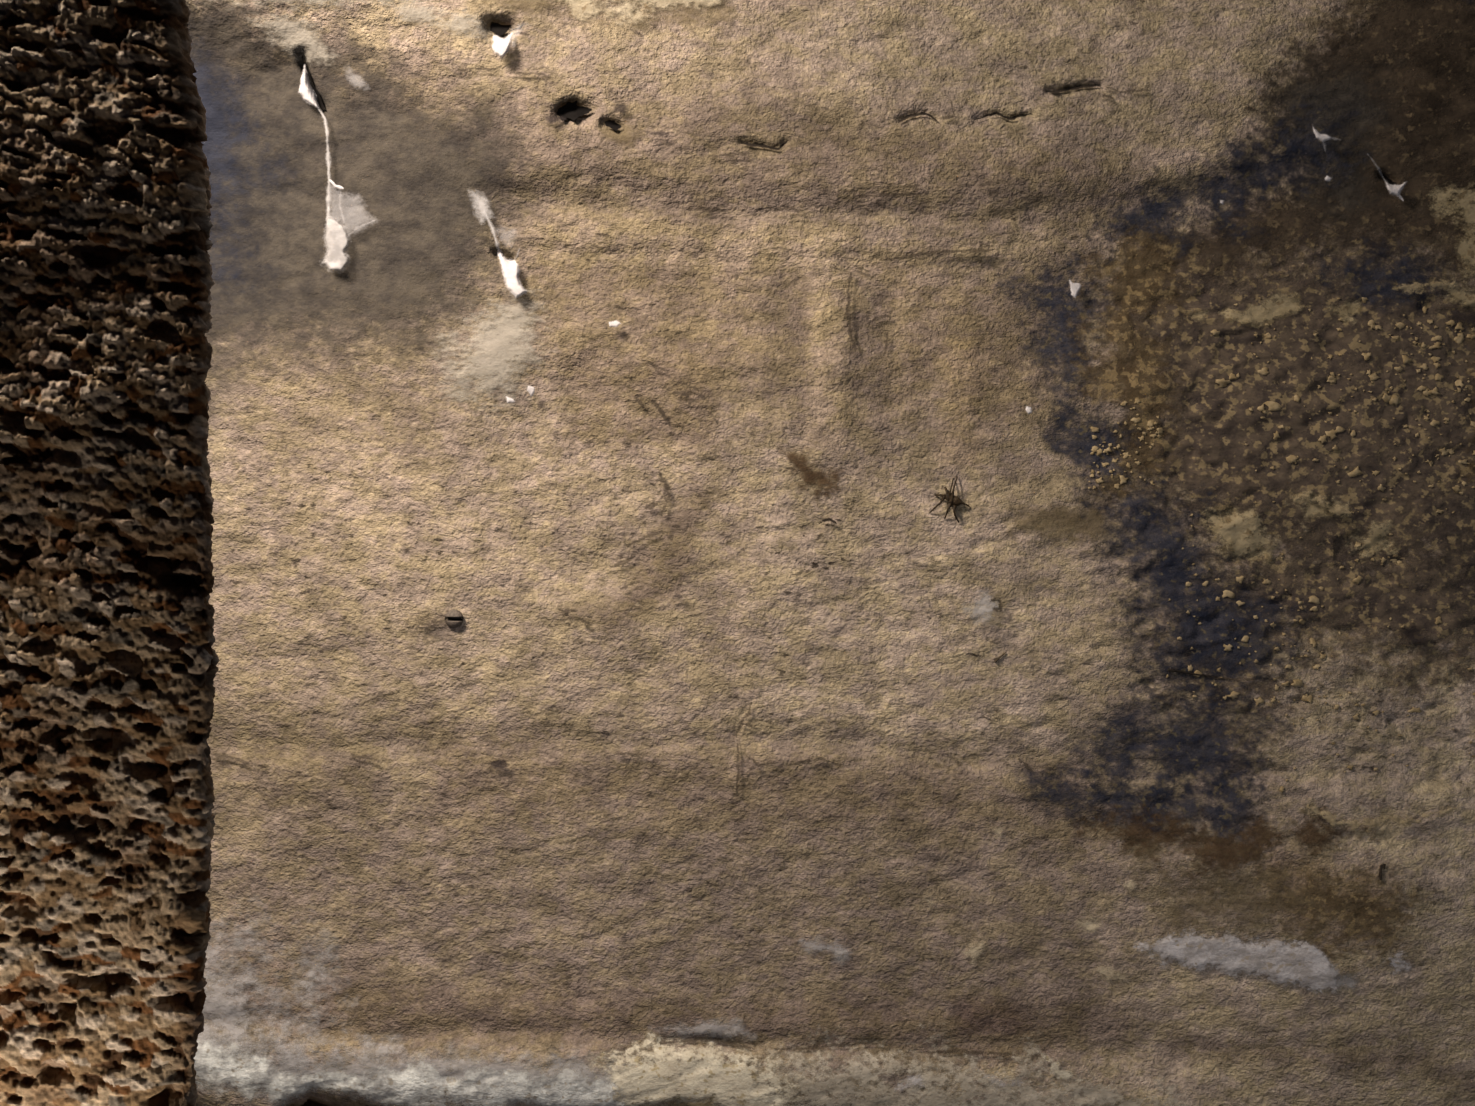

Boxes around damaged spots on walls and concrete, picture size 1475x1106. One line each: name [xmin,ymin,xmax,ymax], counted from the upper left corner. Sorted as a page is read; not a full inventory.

damp [187,0,539,400]
damp [630,0,731,21]
damp [996,0,1475,838]
damp [194,934,1186,1106]